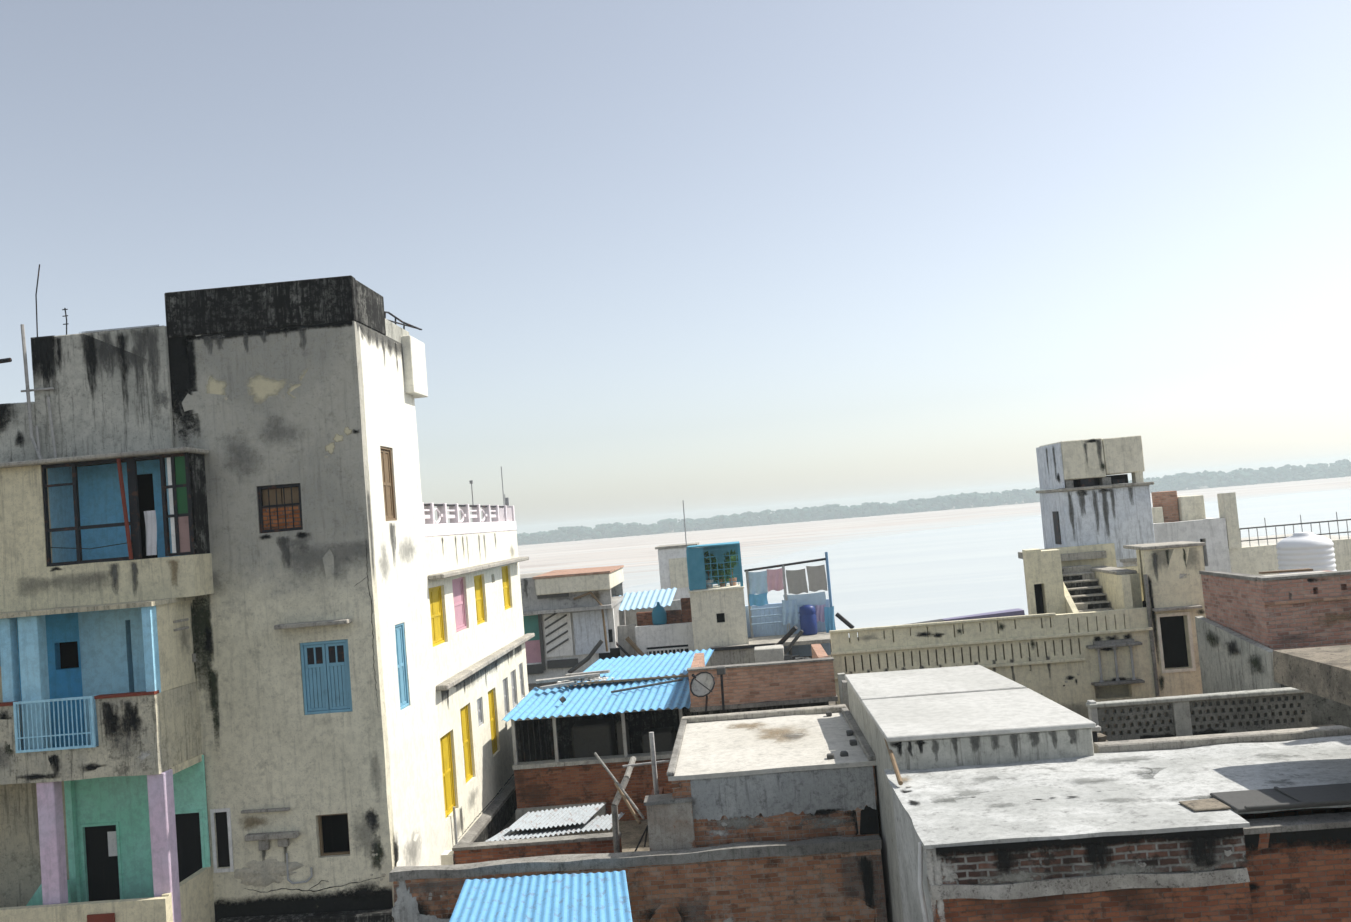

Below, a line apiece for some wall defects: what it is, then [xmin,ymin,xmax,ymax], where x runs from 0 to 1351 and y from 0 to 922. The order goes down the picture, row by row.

water stain [31,335,62,392]
water stain [82,321,404,437]
peeling [248,372,306,402]
water stain [191,596,220,737]
water stain [102,702,141,741]
water stain [859,857,876,922]
water stain [926,827,1351,922]